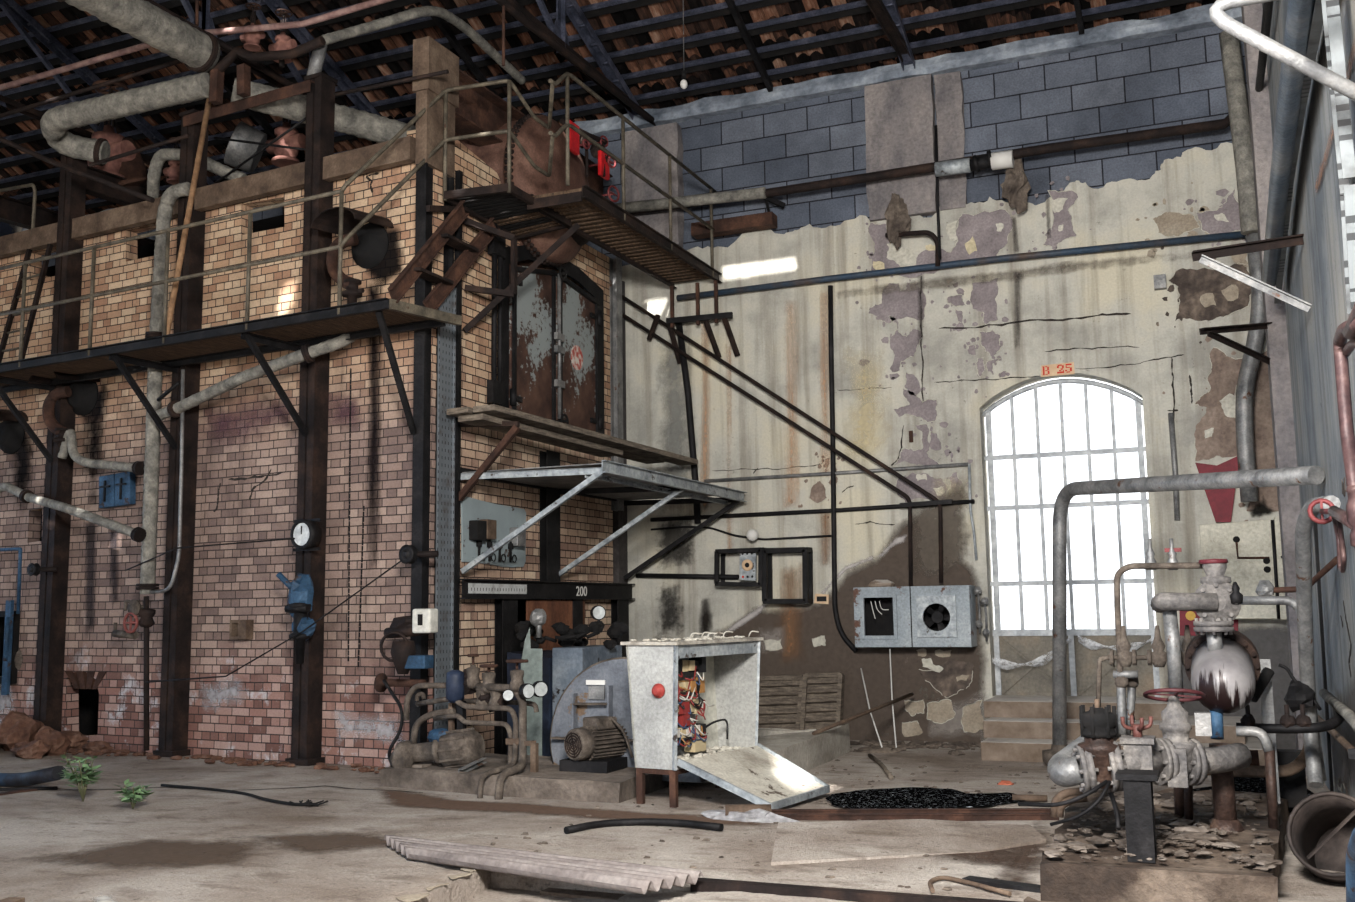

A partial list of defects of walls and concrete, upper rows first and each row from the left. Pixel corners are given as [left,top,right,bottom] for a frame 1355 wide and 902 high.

peeling [1028,176,1091,252]
peeling [855,203,1016,503]
peeling [1136,182,1251,461]
peeling [1253,350,1275,470]
damp [659,520,692,564]
peeling [1238,486,1279,521]
damp [658,588,679,640]
flaking render [902,648,984,737]